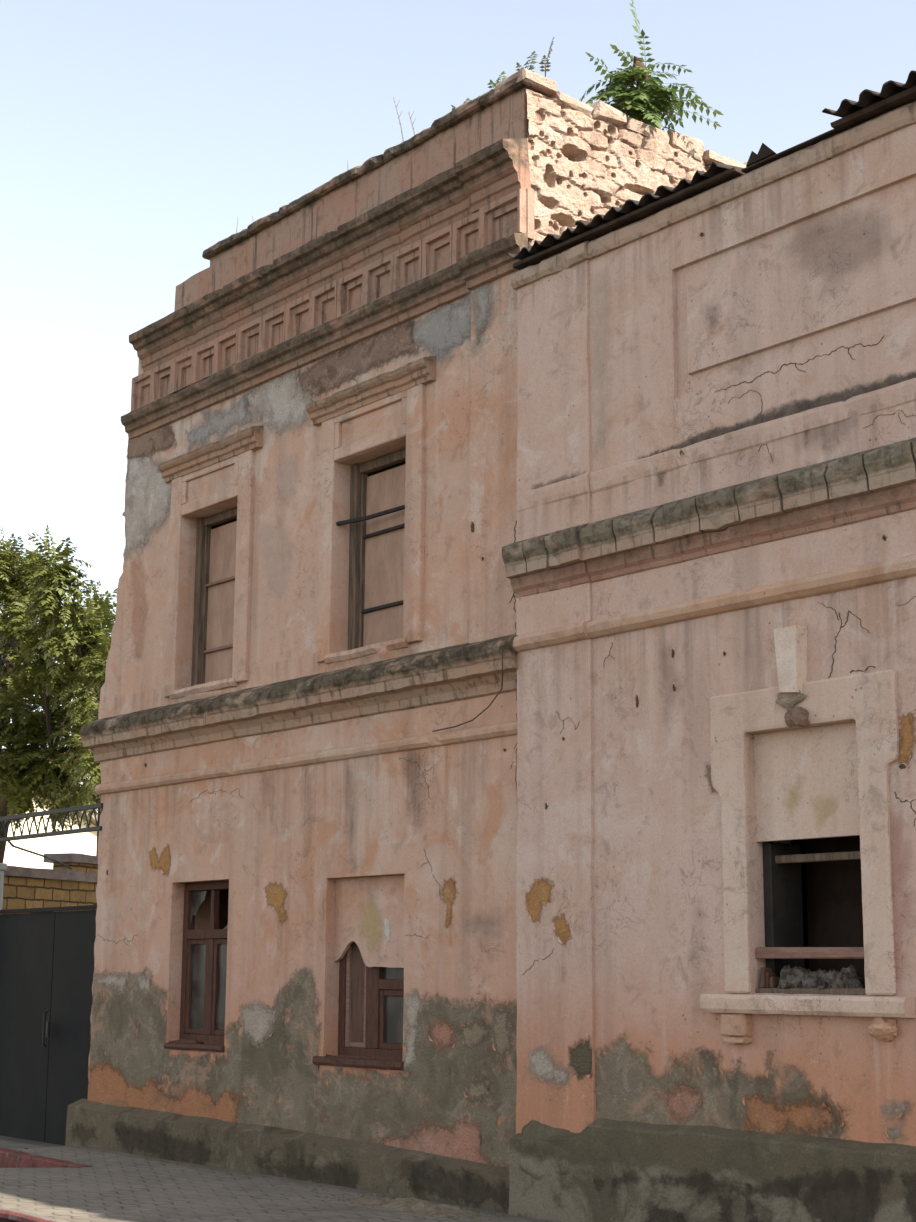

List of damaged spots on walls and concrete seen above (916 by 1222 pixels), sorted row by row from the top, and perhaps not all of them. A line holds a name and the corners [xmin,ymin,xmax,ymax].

spalling [122,283,492,556]
crack [714,336,884,461]
crack [864,407,916,428]
crack [817,601,875,678]
crack [894,791,916,827]
peeling [90,968,517,1167]
peeling [569,1038,844,1139]
leakage [668,1168,916,1222]